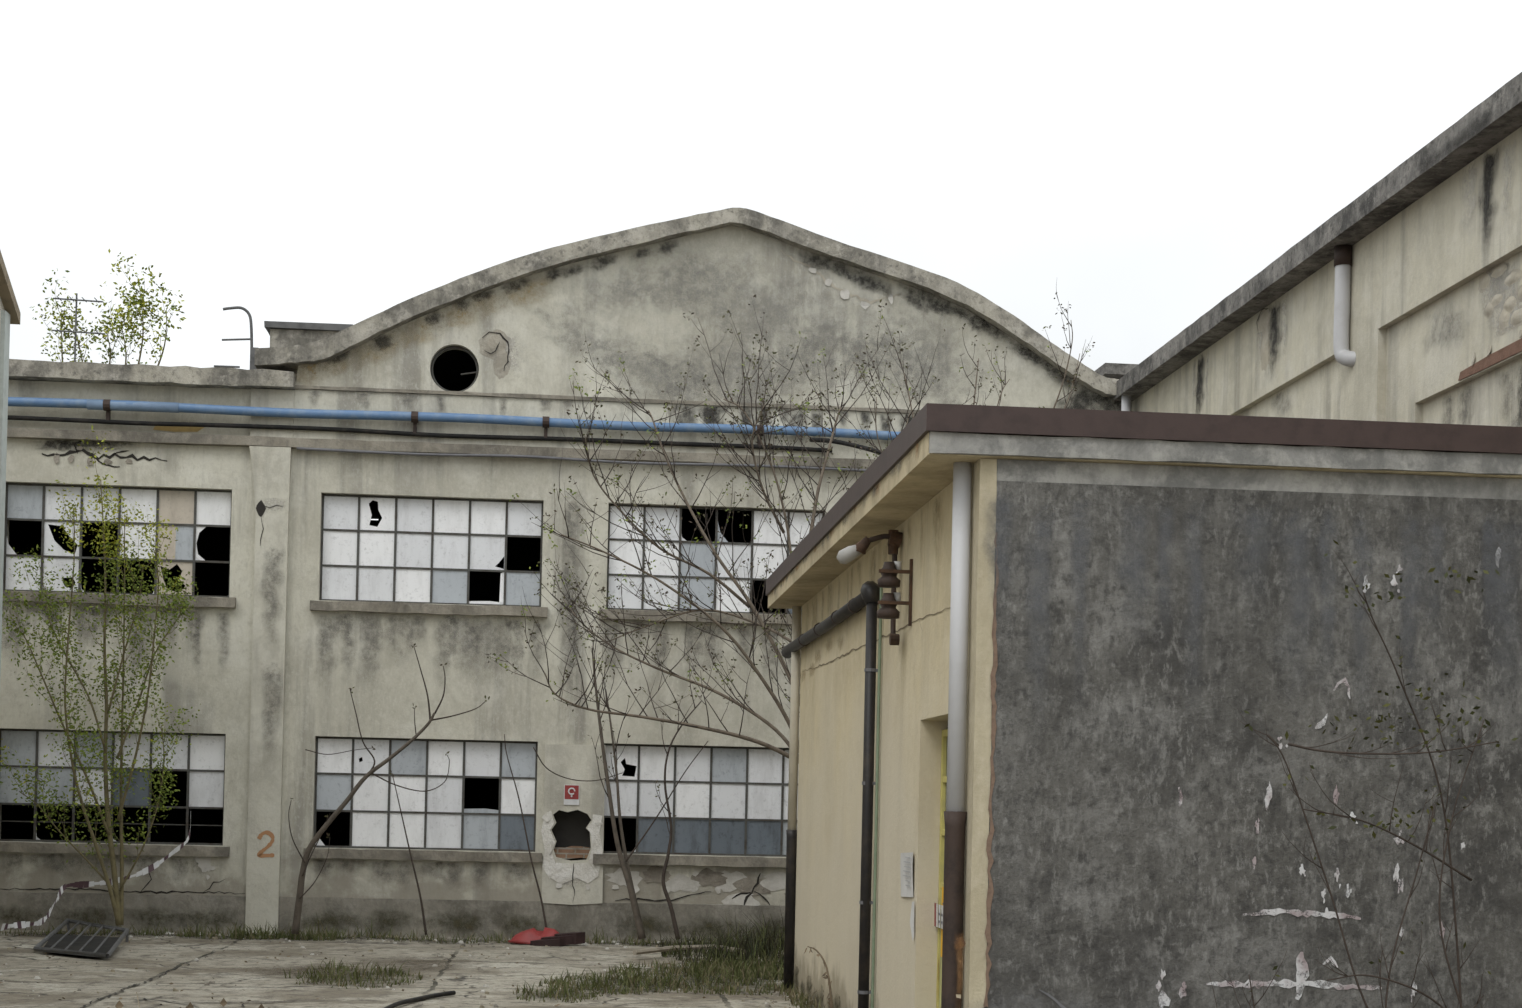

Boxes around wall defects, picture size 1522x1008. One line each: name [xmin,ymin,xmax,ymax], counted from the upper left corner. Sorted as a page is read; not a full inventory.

water stain [1466,150,1510,220]
water stain [1259,306,1286,355]
water stain [1505,375,1522,425]
crack [42,441,167,468]
crack [802,608,949,672]
peeling [1255,781,1272,834]
spalling [541,811,786,906]
peeling [1321,868,1352,904]
peeling [1393,863,1403,894]
crack [80,955,211,1008]
peeling [1156,969,1187,1008]